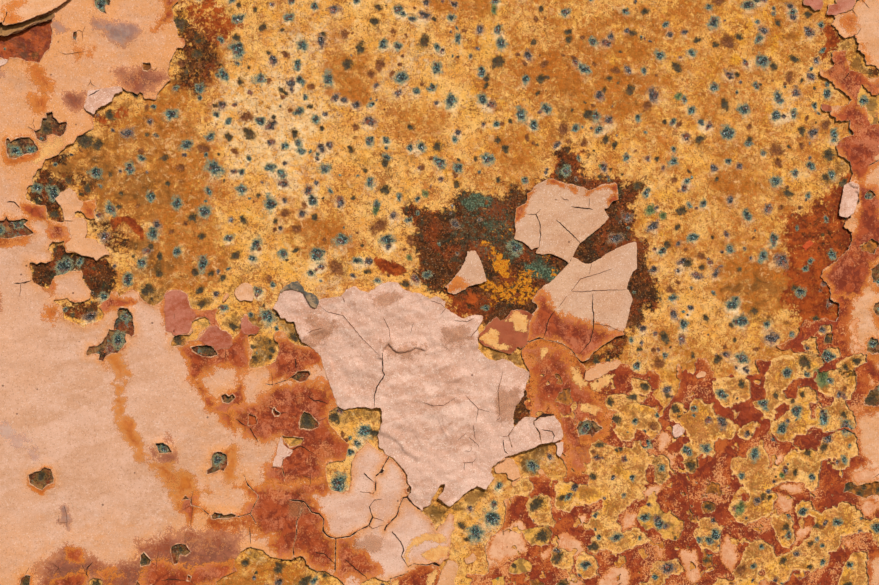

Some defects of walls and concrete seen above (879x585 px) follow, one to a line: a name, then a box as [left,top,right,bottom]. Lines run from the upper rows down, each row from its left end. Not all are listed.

peeling [803,0,879,70]
corrosion [22,60,87,116]
spalling [756,54,801,121]
spalling [263,183,318,217]
crack [309,299,413,406]
peeling [445,251,487,294]
crack [528,264,626,379]
corrosion [467,50,879,585]
corrosion [17,330,385,585]
crack [423,372,555,468]
crack [275,446,439,578]
corrosion [390,565,441,585]